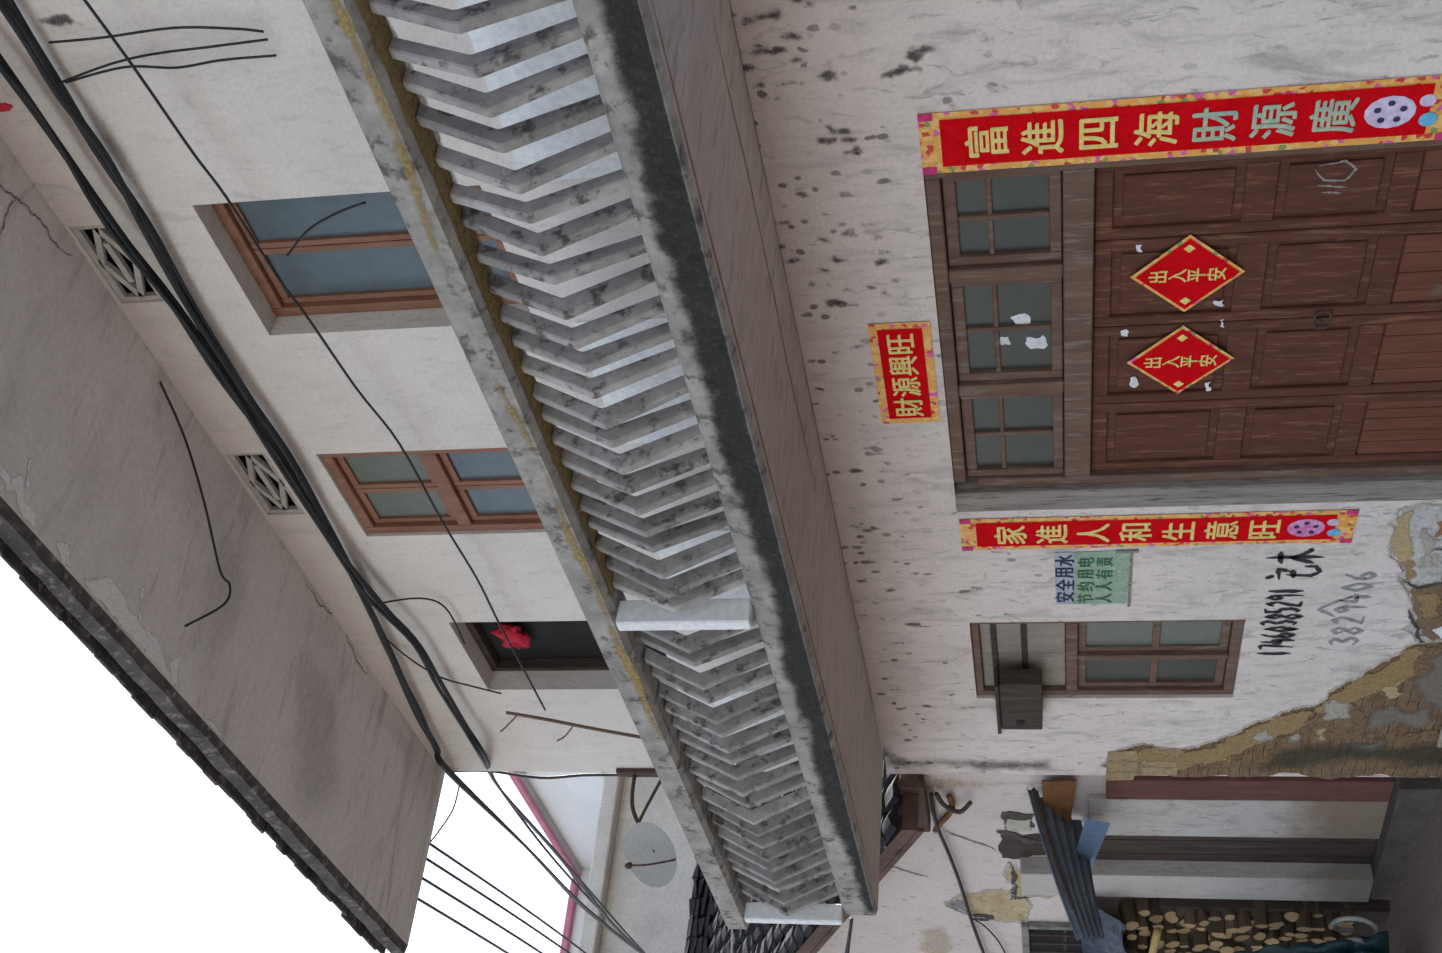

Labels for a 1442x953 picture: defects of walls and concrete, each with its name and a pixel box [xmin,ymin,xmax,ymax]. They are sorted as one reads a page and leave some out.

crack [0,184,75,256]
flaking render [1099,503,1442,781]
flaking render [943,811,1054,924]